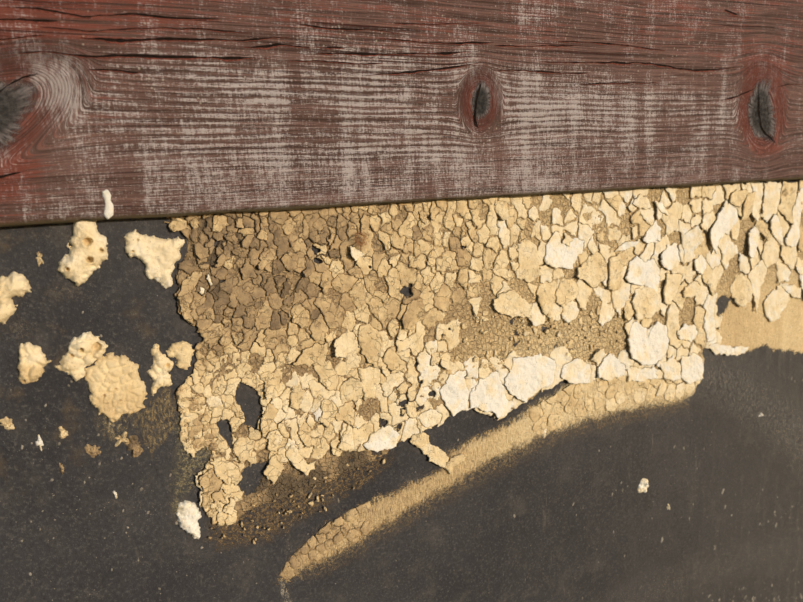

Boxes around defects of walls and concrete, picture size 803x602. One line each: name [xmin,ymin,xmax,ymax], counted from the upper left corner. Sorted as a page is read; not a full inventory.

peeling [164,180,803,583]